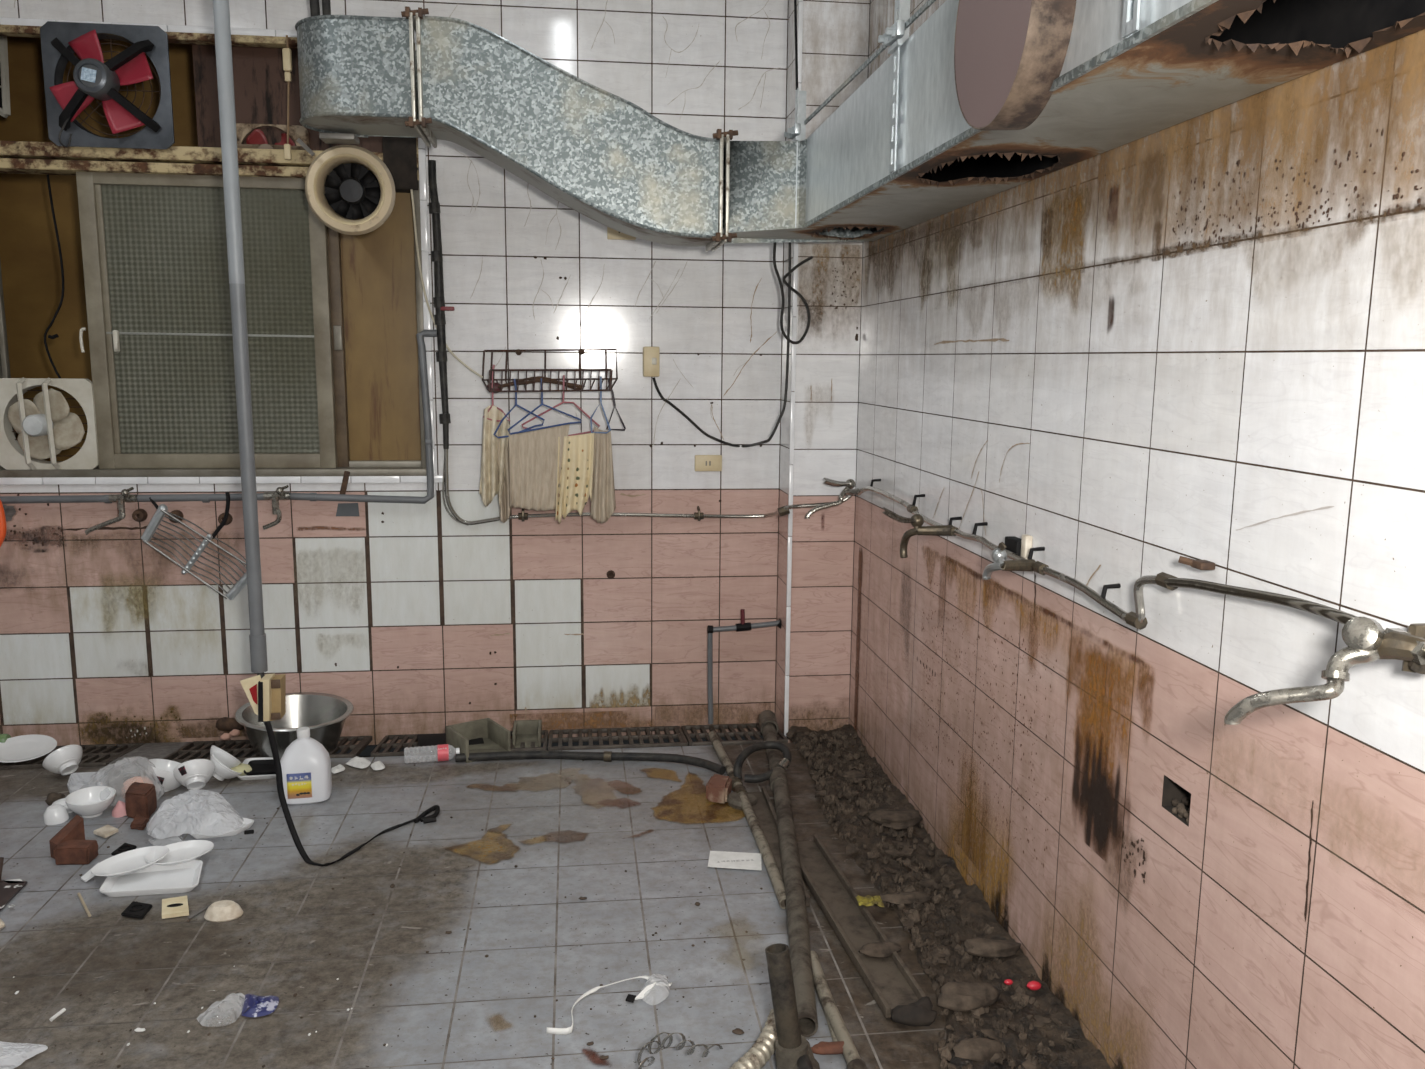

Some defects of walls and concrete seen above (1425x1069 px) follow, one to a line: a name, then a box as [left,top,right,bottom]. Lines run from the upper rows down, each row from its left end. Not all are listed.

leakage [800,210,976,320]
leakage [1042,189,1088,294]
leakage [1109,129,1425,267]
mould [80,707,244,745]
corrosion [919,548,1153,932]